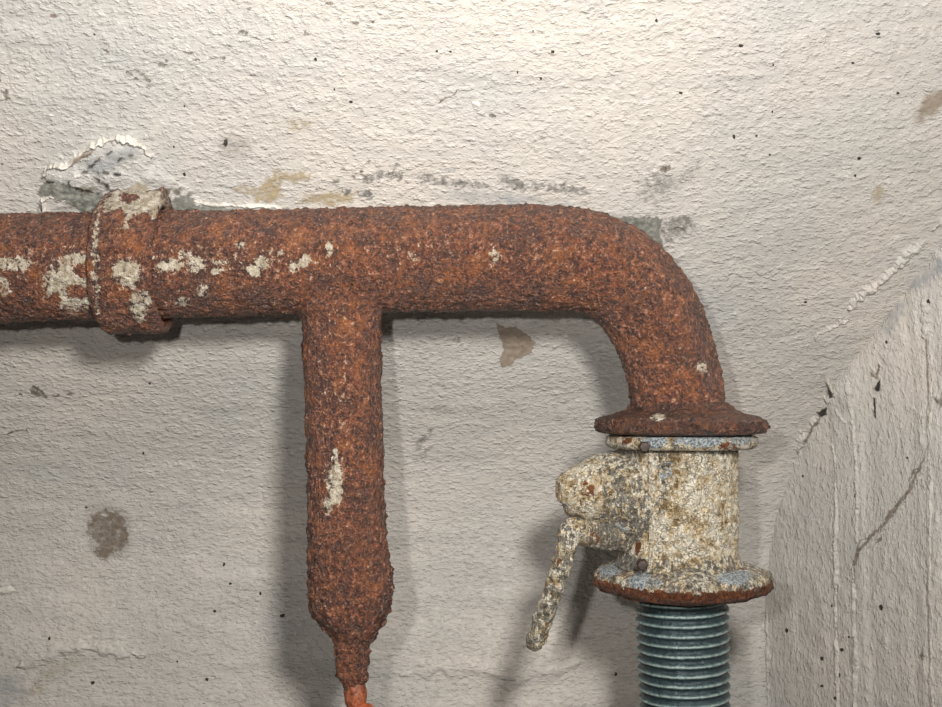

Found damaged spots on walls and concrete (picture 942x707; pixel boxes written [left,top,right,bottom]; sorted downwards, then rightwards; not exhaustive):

spalling [39,151,133,213]
water stain [89,509,128,558]
crack [852,313,935,707]